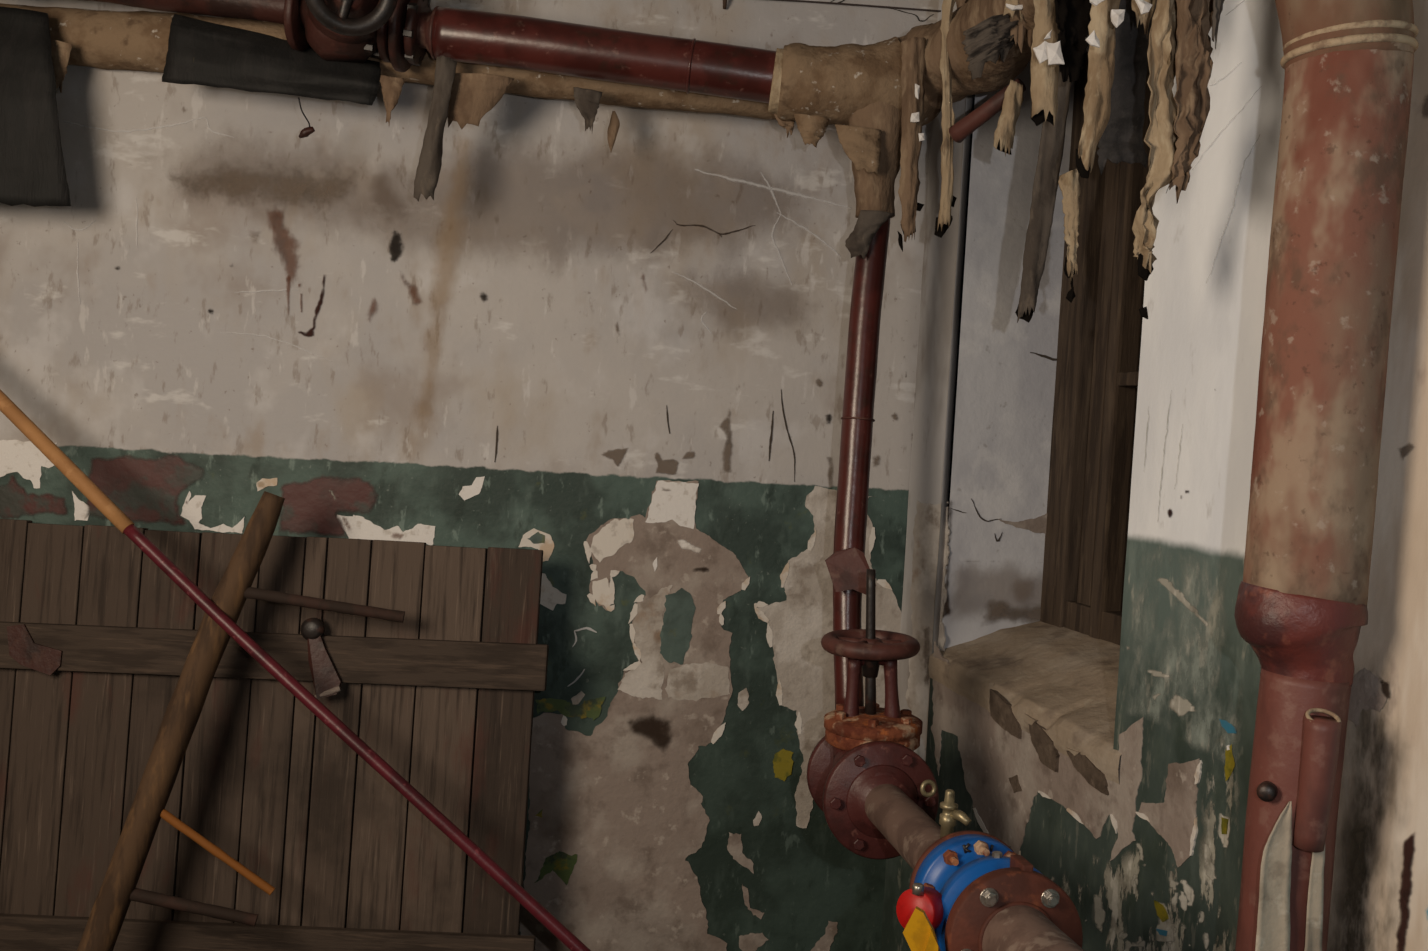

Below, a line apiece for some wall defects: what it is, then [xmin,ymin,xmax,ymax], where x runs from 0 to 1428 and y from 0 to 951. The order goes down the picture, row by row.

spalling [1033,30,1065,65]
spalling [1086,30,1100,48]
spalling [1090,0,1152,28]
corrosion [270,212,302,312]
peeling [0,440,245,533]
peeling [256,477,435,545]
peeling [459,476,485,500]
spalling [519,452,768,951]
spalling [754,486,837,828]
spalling [861,500,1236,951]
leakage [1330,784,1382,951]
leakage [1397,835,1414,951]